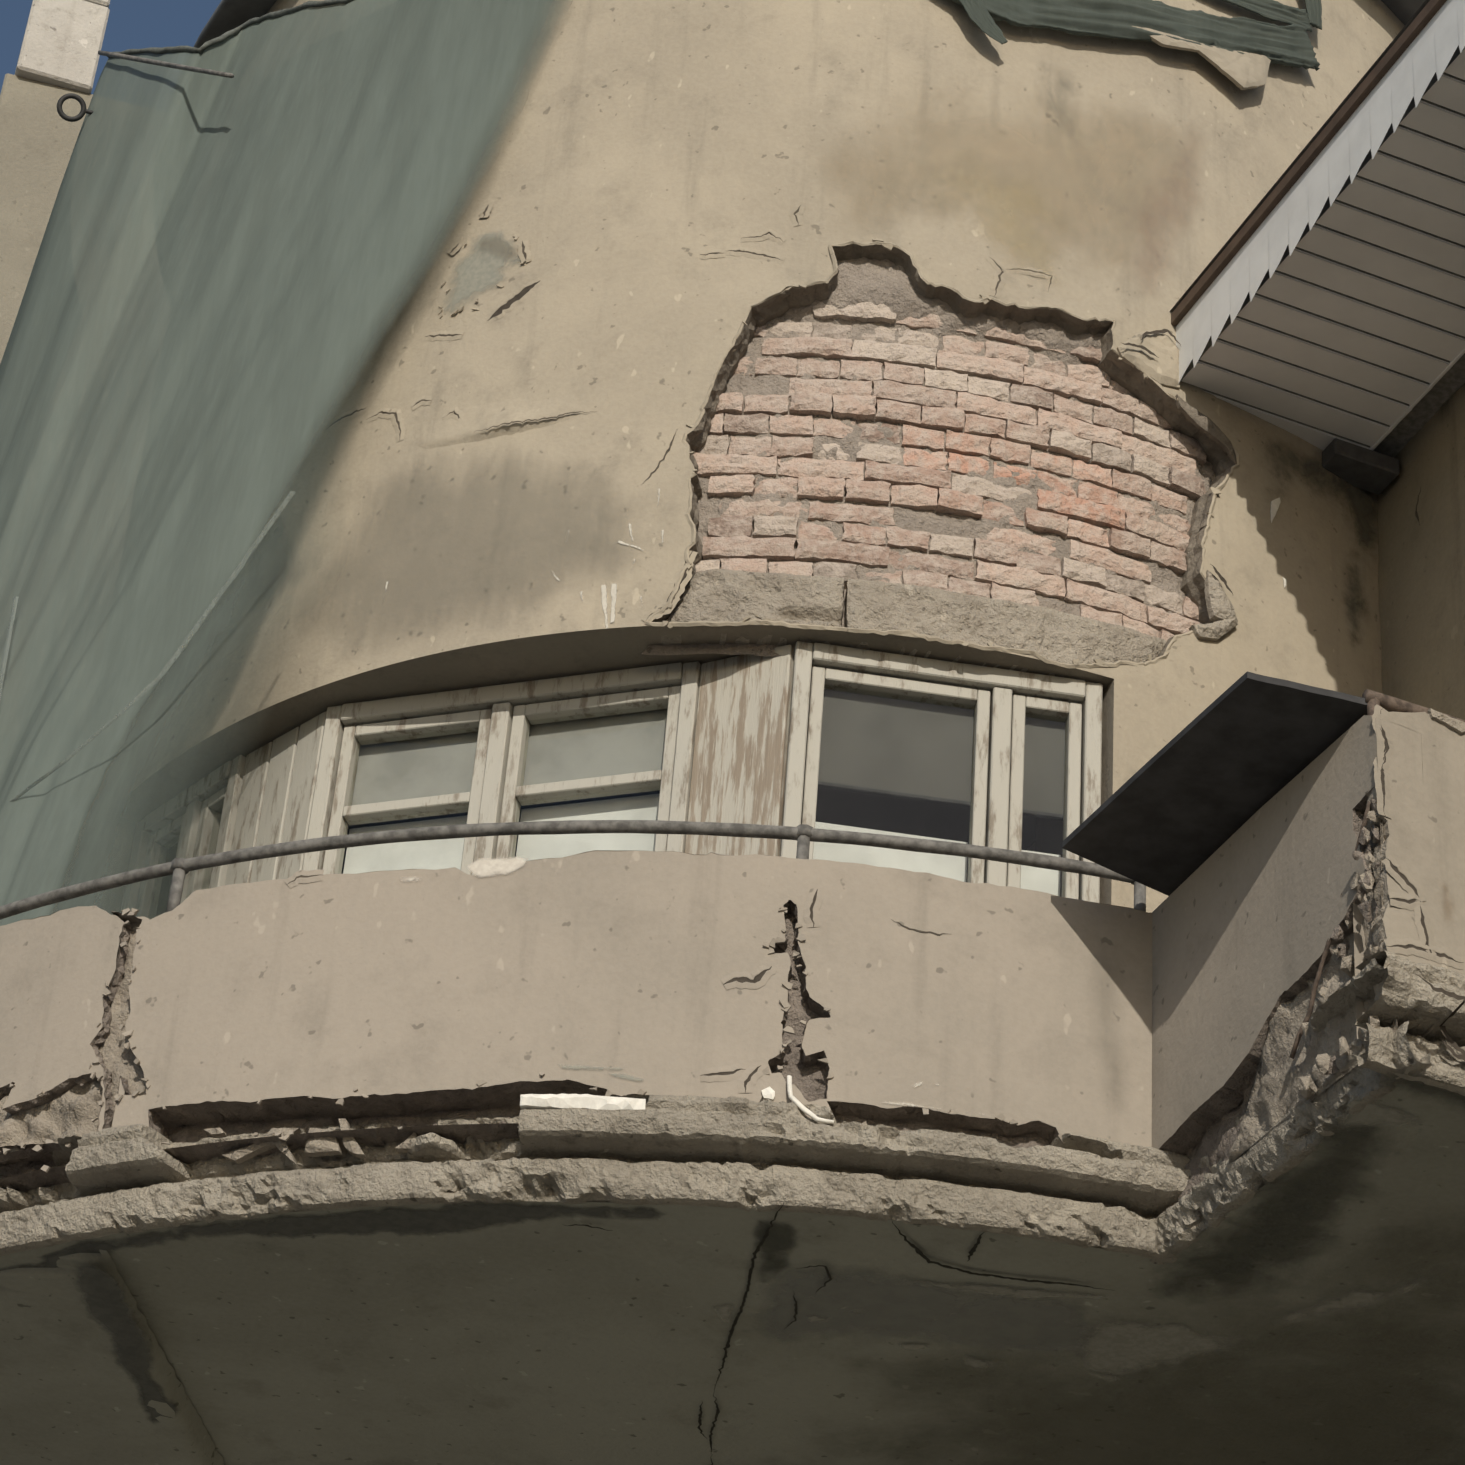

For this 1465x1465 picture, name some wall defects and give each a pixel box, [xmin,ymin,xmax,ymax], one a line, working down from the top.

flaking render [641,238,1240,676]
crack [1372,704,1395,819]
peeling [1427,708,1465,734]
spalling [0,907,647,1192]
spalling [763,900,1066,1149]
spalling [1159,786,1398,1206]
crack [1382,855,1465,1061]
leakage [1396,1076,1465,1104]
crack [697,1196,789,1465]
crack [787,1265,832,1327]
crack [892,1221,1115,1291]
leakage [1175,1100,1411,1289]